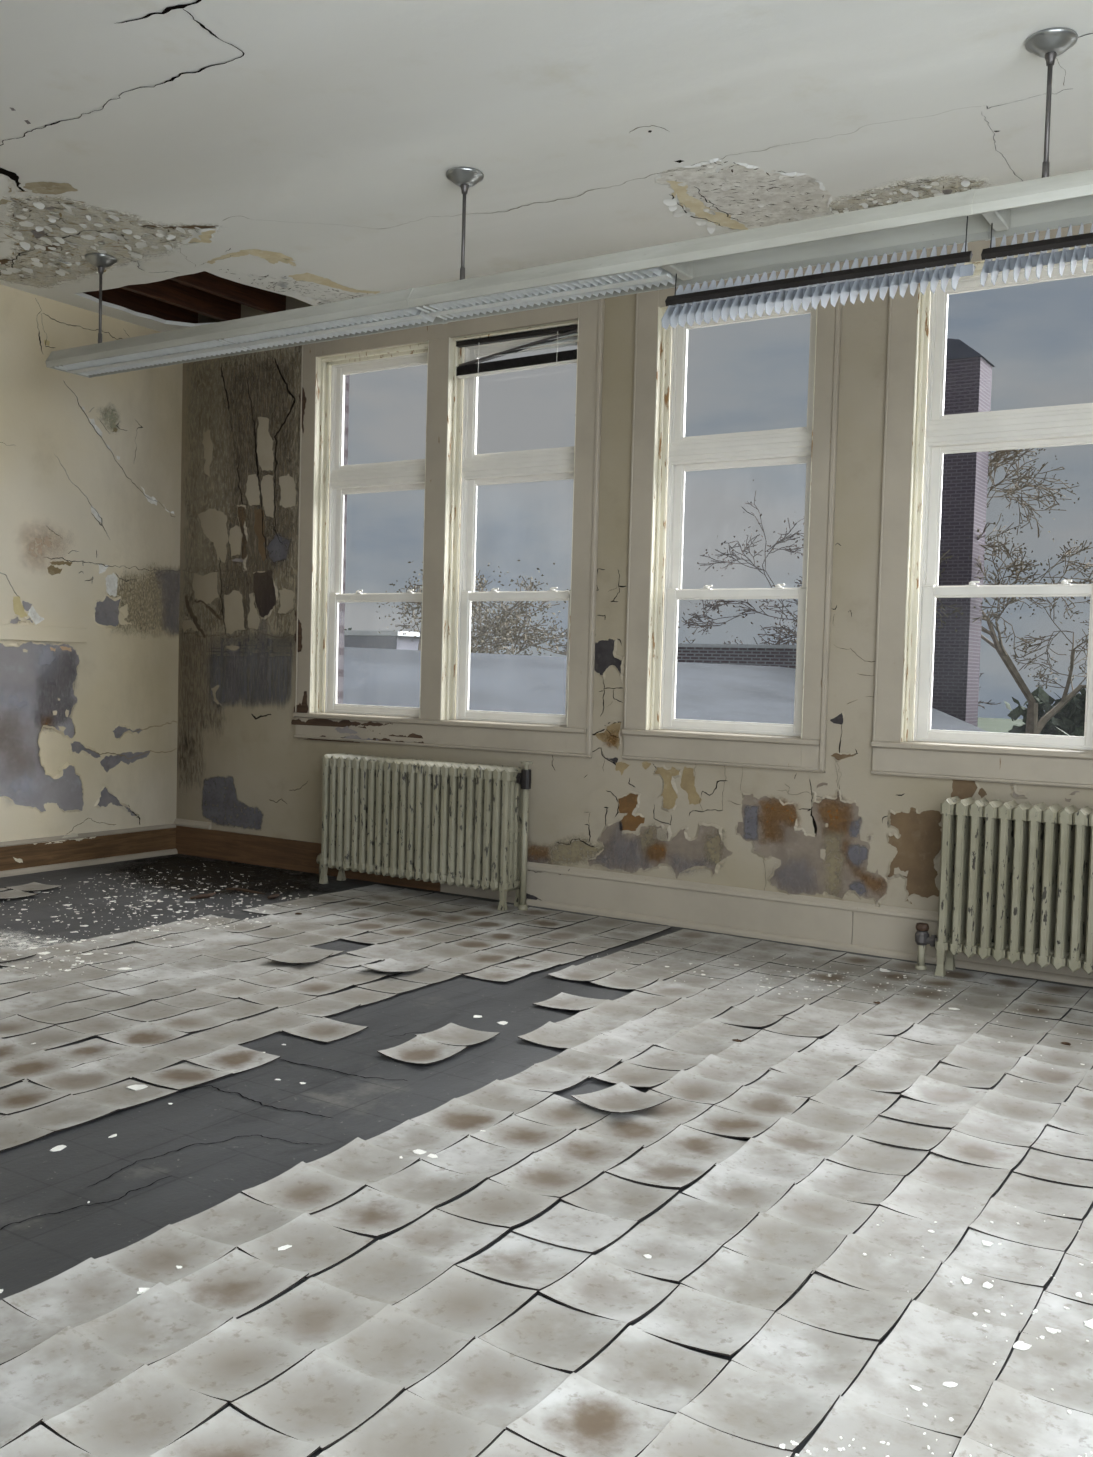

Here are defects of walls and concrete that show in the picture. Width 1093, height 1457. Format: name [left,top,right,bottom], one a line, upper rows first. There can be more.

crack [0,0,244,146]
flaking render [0,182,380,303]
flaking render [654,158,982,234]
peeling [0,570,263,845]
peeling [594,638,625,684]
peeling [588,711,987,907]